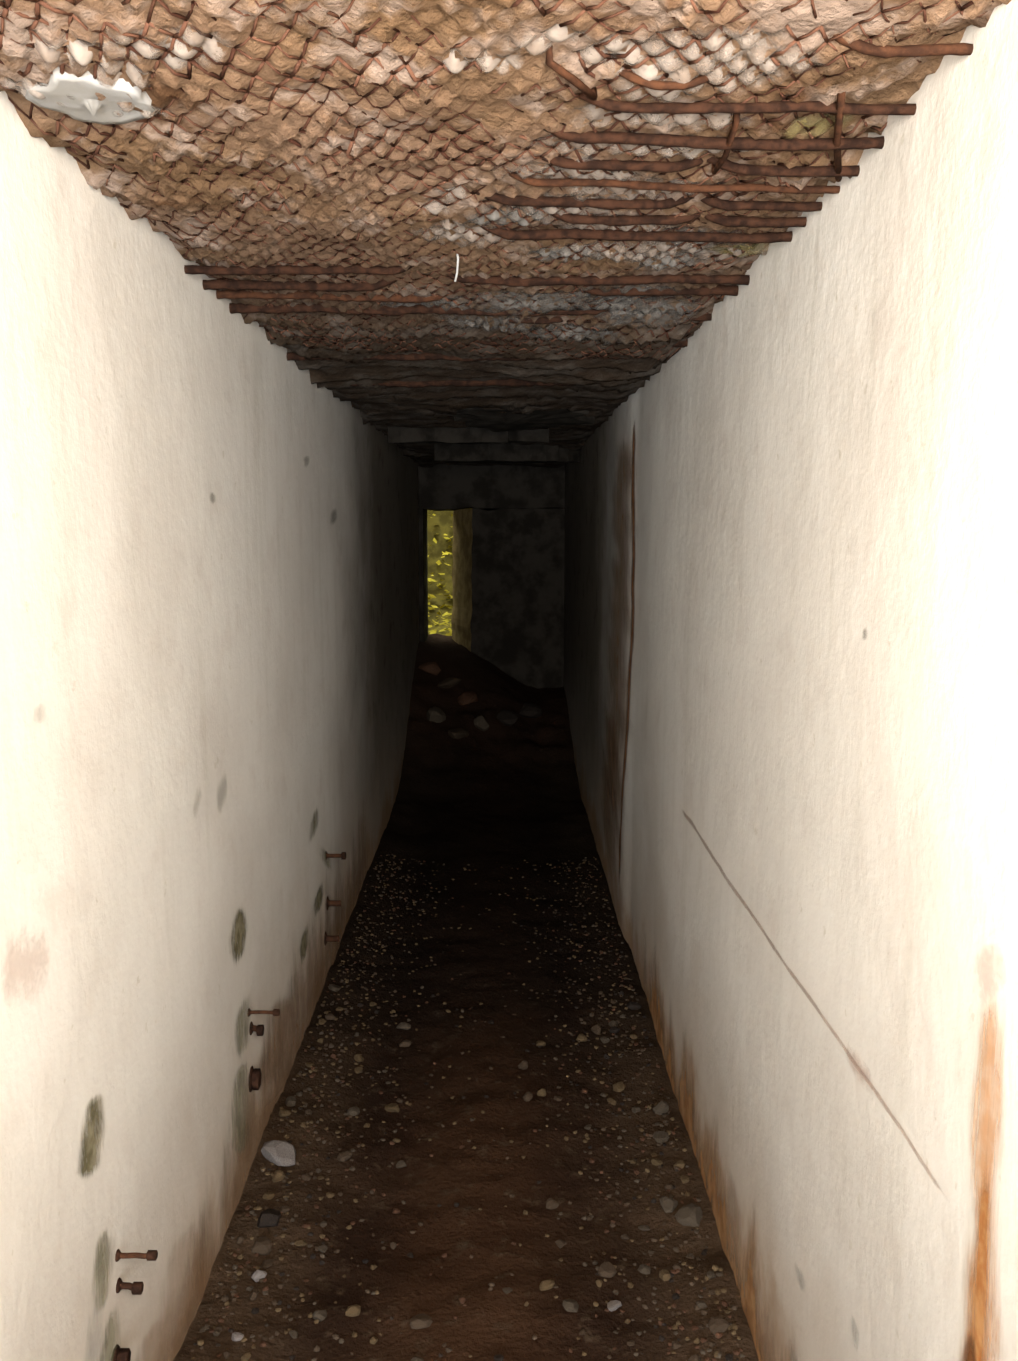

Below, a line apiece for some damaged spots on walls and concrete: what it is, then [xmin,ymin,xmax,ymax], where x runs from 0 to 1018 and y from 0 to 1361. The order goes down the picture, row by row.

flaking render [2,27,226,125]
spalling [442,23,816,130]
spalling [384,139,763,345]
corrosion [604,428,635,877]
damp [300,930,308,958]
damp [314,888,322,913]
damp [237,1008,247,1053]
damp [232,1069,245,1152]
corrosion [647,968,765,1361]
corrosion [964,1010,1001,1361]
damp [96,1238,115,1361]